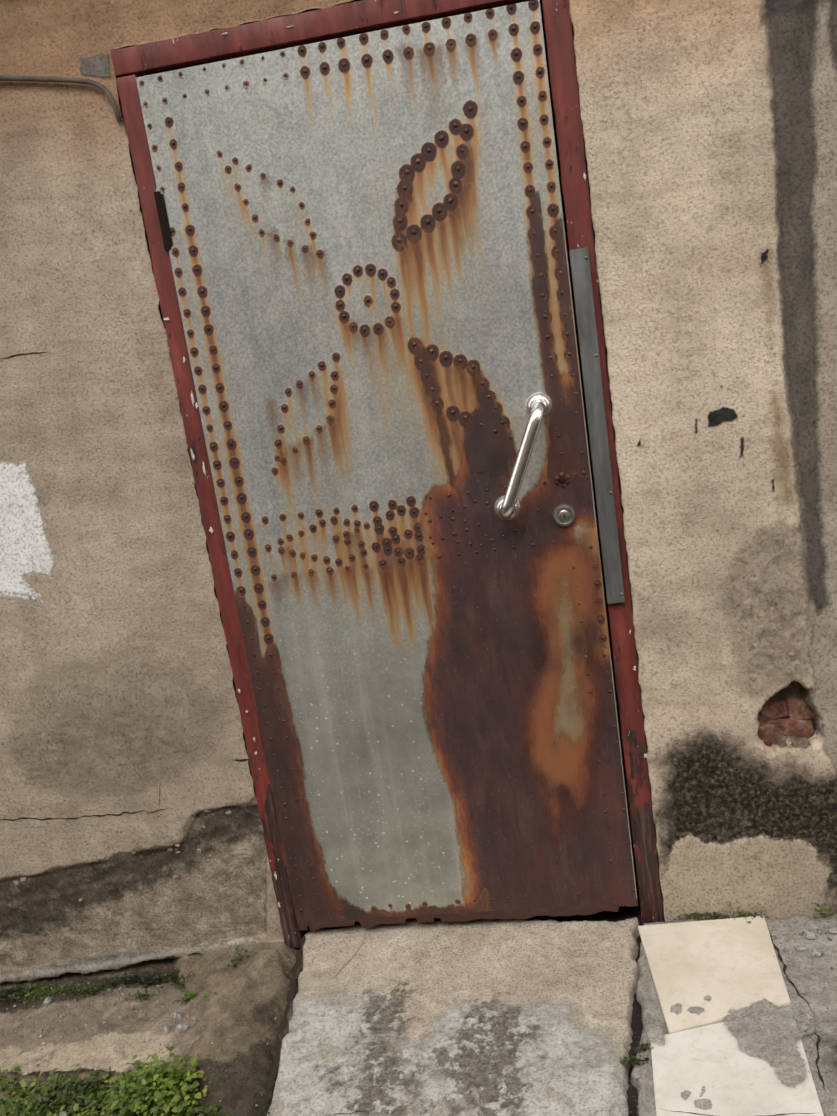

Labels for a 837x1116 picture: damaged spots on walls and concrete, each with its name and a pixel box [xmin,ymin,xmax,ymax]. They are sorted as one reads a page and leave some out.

corrosion [394,168,413,248]
corrosion [234,191,637,922]
flaking render [726,521,821,748]
crack [1,785,180,821]
leakage [654,732,837,910]